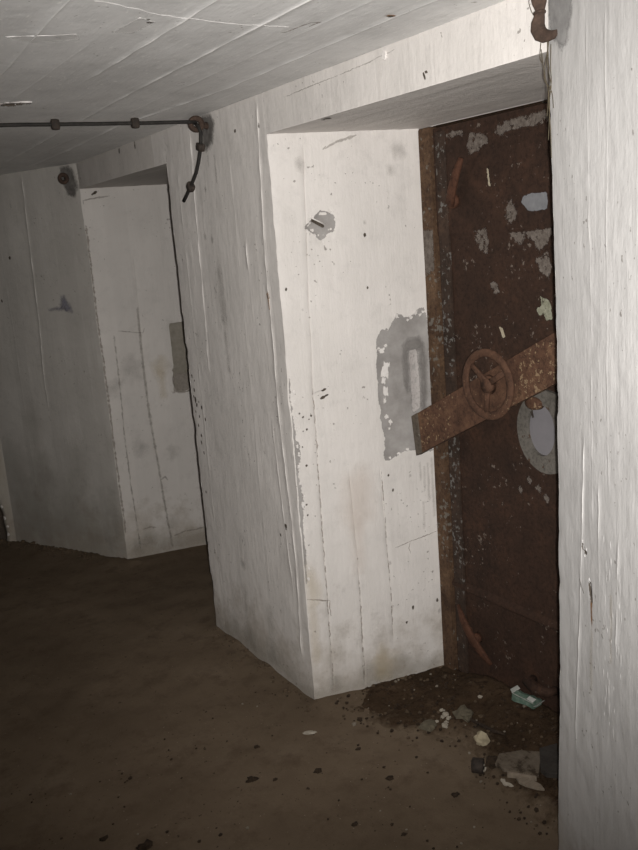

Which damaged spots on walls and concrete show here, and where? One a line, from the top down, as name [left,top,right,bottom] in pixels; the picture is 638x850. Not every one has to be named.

spalling [305,209,337,244]
peeling [376,308,431,460]